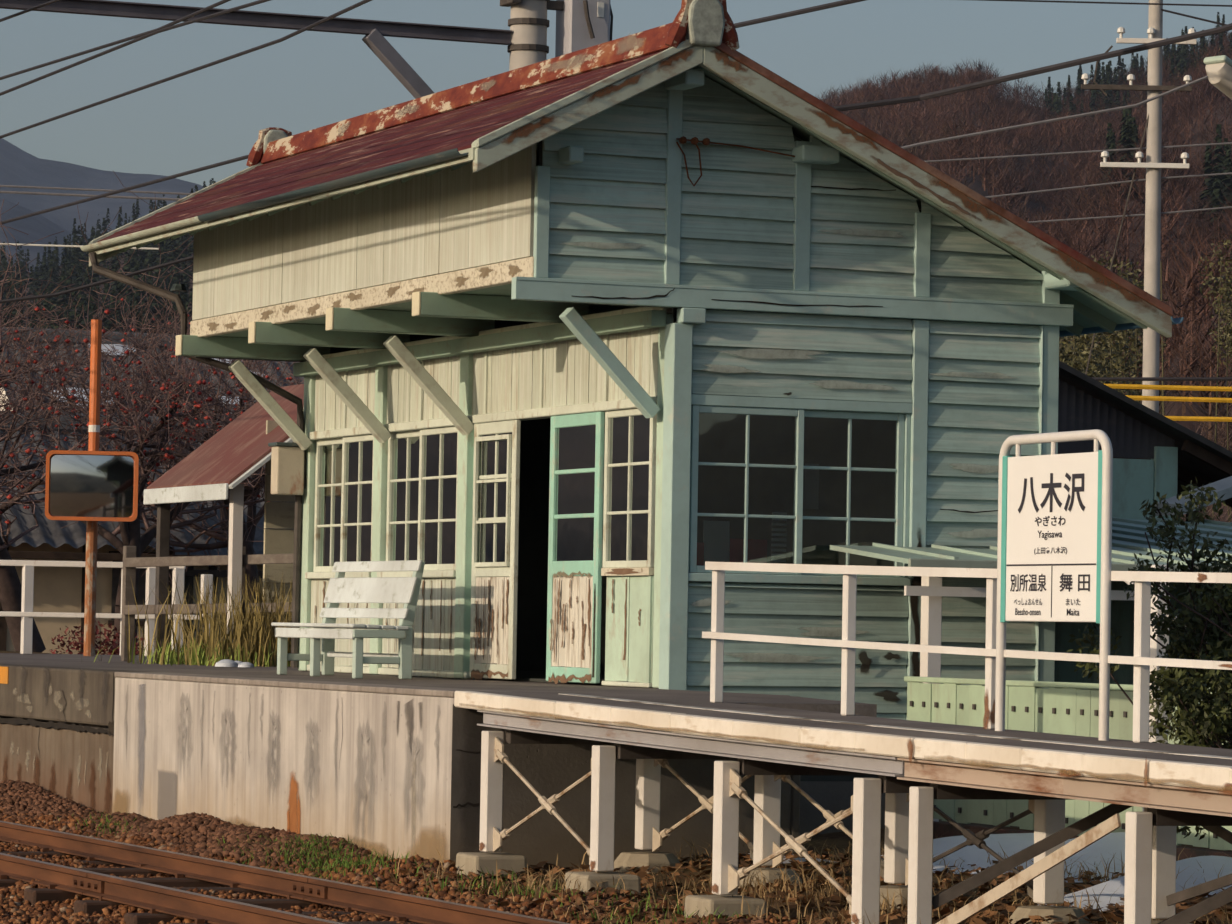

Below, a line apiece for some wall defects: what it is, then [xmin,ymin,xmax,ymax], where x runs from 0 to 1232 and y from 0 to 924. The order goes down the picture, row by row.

corrosion [590,74,642,100]
corrosion [505,117,553,143]
corrosion [810,110,1002,223]
peeling [261,293,362,320]
peeling [456,267,493,287]
crack [572,288,675,299]
crack [711,299,883,307]
peeling [474,580,509,660]
peeling [550,579,591,661]
leakage [397,701,421,743]
leakage [158,772,176,820]
corrosion [287,775,300,834]